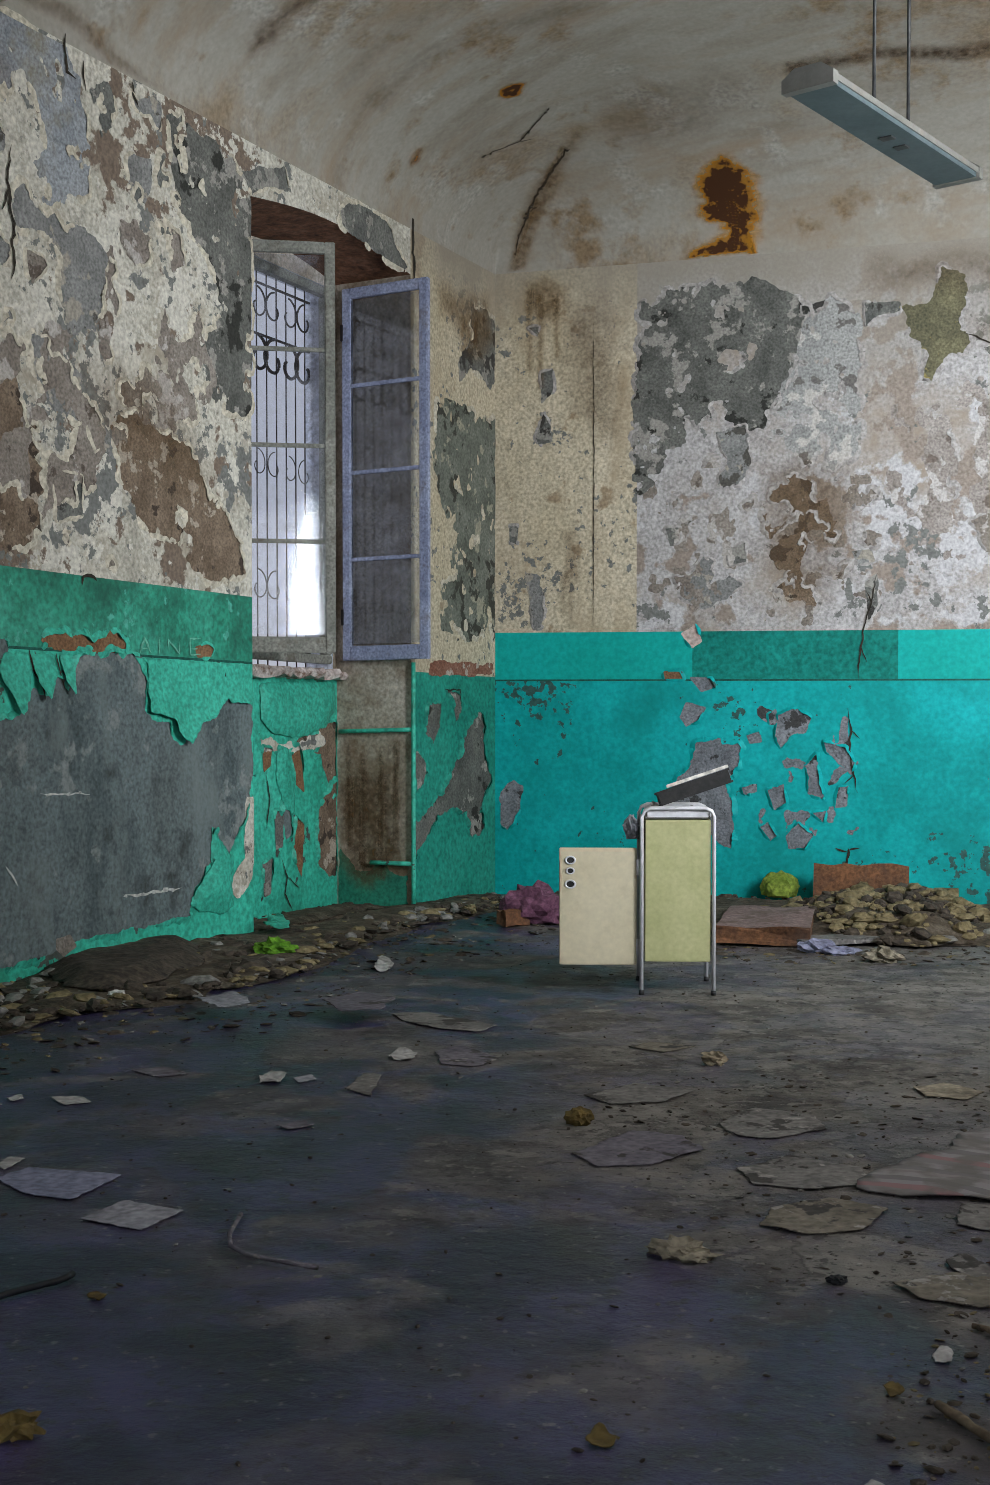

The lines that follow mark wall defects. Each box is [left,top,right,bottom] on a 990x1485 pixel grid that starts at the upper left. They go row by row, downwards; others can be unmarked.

peeling [0,6,289,589]
peeling [458,300,496,390]
rust [689,155,760,258]
peeling [432,396,520,643]
flaking render [627,261,990,648]
peeling [0,625,408,974]
water stain [343,750,400,882]
peeling [416,660,523,859]
peeling [661,668,859,851]